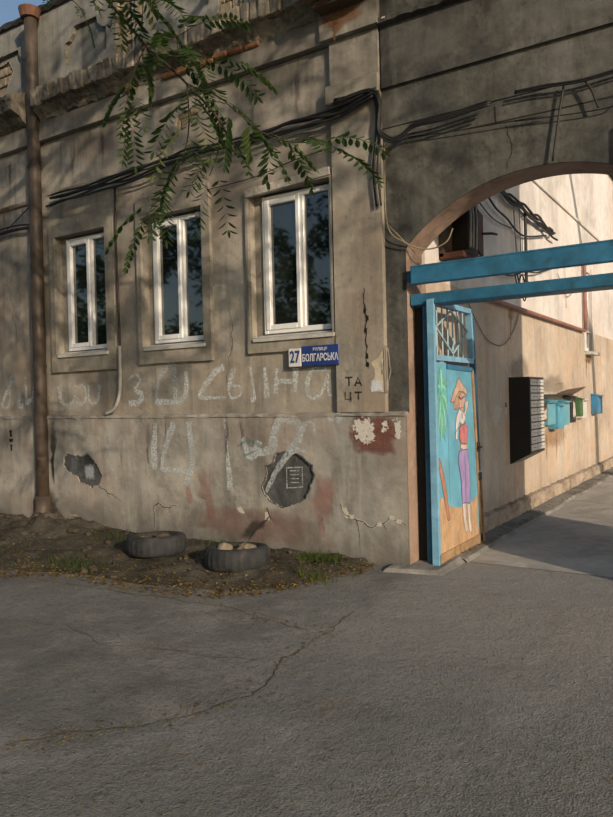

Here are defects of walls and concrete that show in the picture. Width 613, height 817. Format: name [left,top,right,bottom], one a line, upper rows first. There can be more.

flaking render [113,0,155,56]
rust [323,6,357,41]
flaking render [0,61,14,97]
crack [362,289,370,367]
flaking render [369,345,391,393]
peeling [351,416,402,453]
flaking render [63,452,102,490]
flaking render [261,450,315,509]
crack [340,503,407,539]
crack [6,580,354,745]